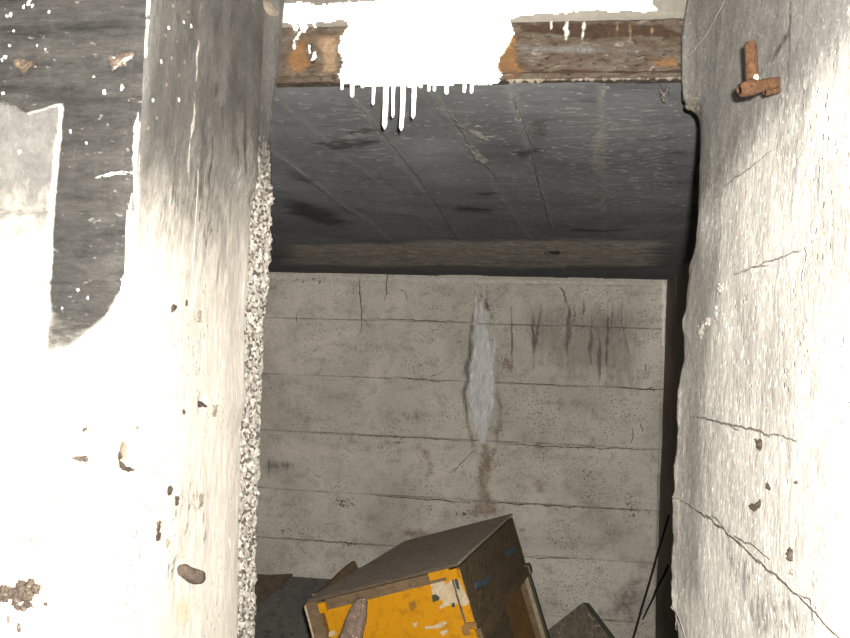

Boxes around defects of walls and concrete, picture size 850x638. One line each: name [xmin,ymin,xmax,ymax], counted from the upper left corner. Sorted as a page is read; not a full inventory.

crack [735,247,808,285]
crack [359,274,469,334]
water stain [268,273,677,444]
crack [690,413,797,442]
crack [670,496,844,638]
spalling [0,578,44,632]